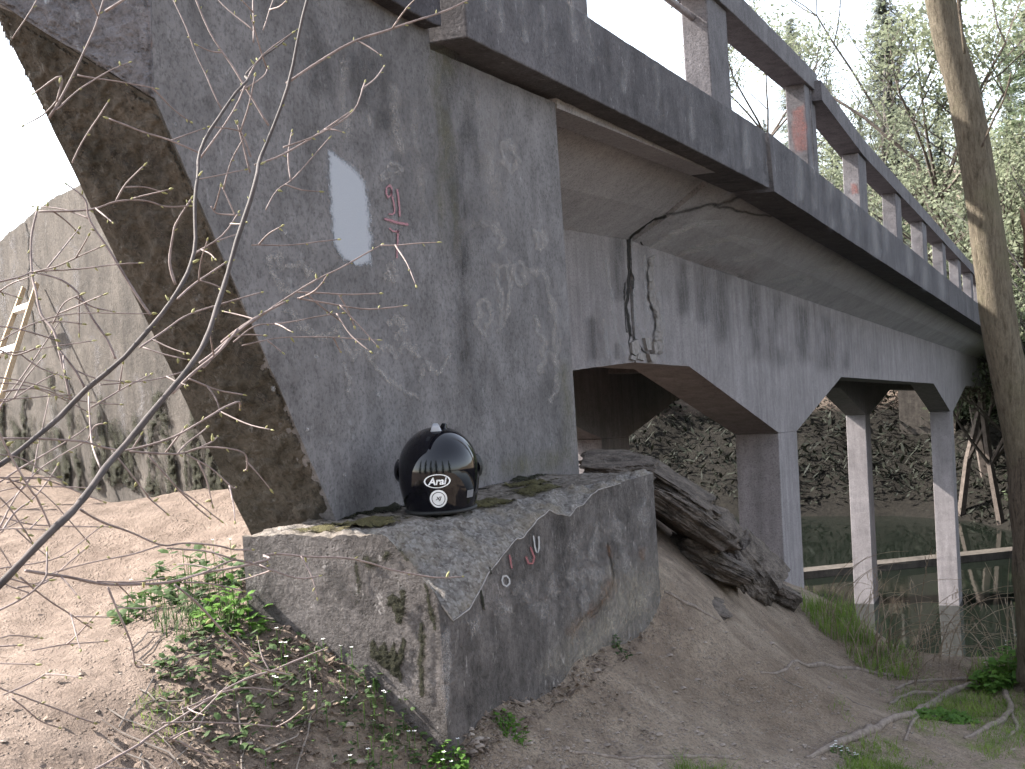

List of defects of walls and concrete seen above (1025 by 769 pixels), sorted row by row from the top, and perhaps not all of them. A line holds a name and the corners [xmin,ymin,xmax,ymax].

crack [623,197,770,355]